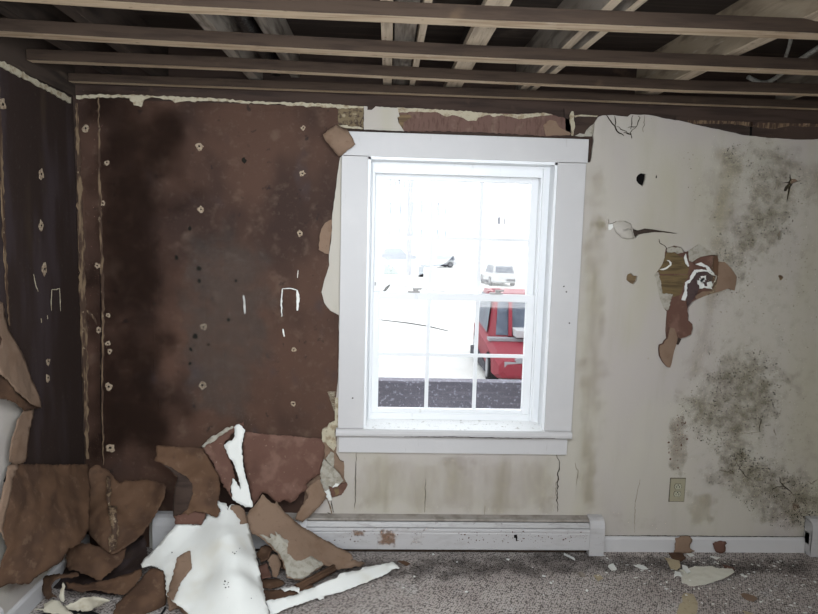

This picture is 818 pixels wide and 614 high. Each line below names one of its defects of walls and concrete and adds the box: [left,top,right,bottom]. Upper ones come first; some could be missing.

peeling [397,107,597,162]
crack [606,115,645,138]
damp [89,97,182,459]
peeling [0,67,365,614]
spalling [654,240,737,368]
damp [679,336,818,527]
rust [380,530,398,544]